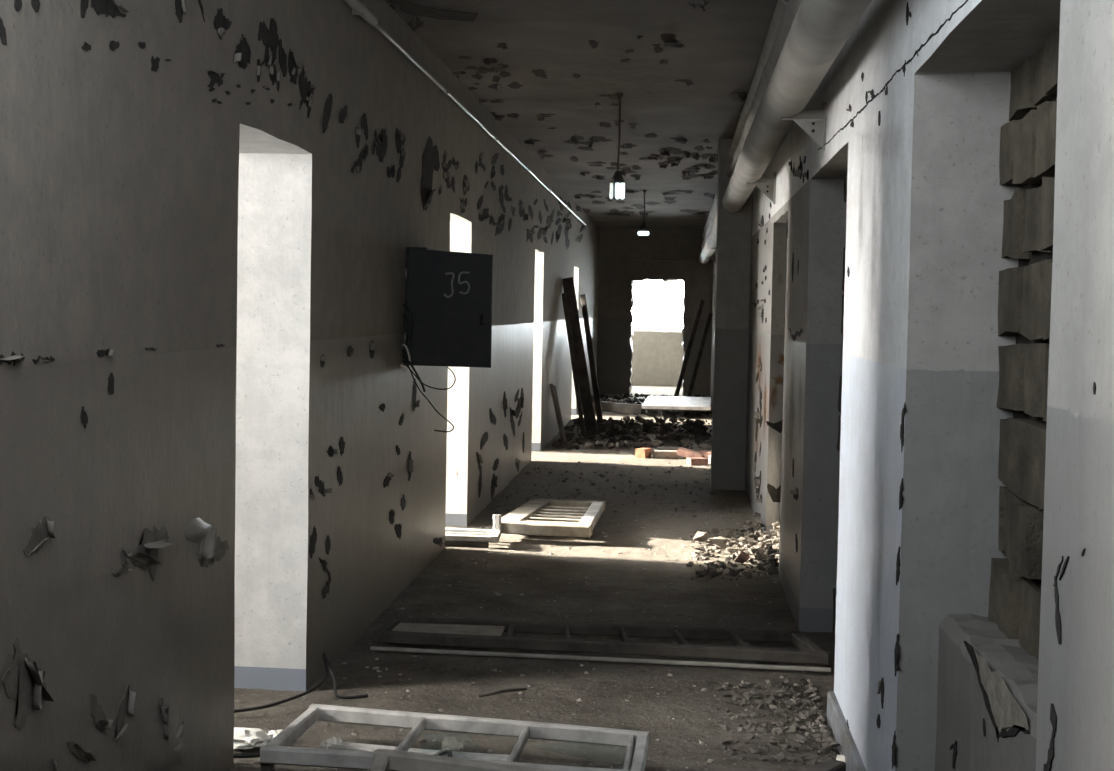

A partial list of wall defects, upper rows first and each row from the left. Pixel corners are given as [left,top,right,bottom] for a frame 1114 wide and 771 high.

peeling [80,0,130,18]
peeling [207,8,406,183]
crack [818,0,968,150]
peeling [420,114,718,249]
peeling [309,437,345,501]
peeling [476,388,525,500]
peeling [751,357,799,503]
peeling [113,526,177,581]
peeling [309,526,331,599]
peeling [1053,548,1085,644]
peeling [2,637,54,730]
peeling [1043,703,1057,771]